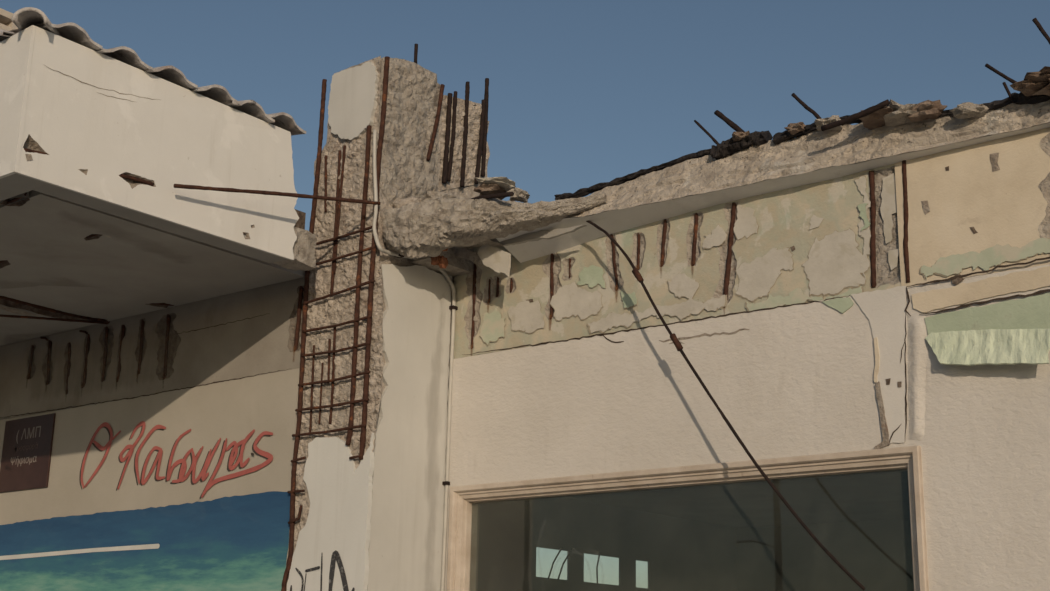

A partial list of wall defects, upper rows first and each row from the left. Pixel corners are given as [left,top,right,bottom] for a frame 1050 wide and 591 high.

spalling [23,134,49,161]
crack [46,66,160,102]
spalling [119,172,156,189]
spalling [431,100,1050,277]
corrosion [868,160,910,288]
spalling [0,296,110,324]
corrosion [287,286,304,360]
spalling [281,44,514,591]
peeling [479,175,1050,449]
crack [888,257,1050,446]